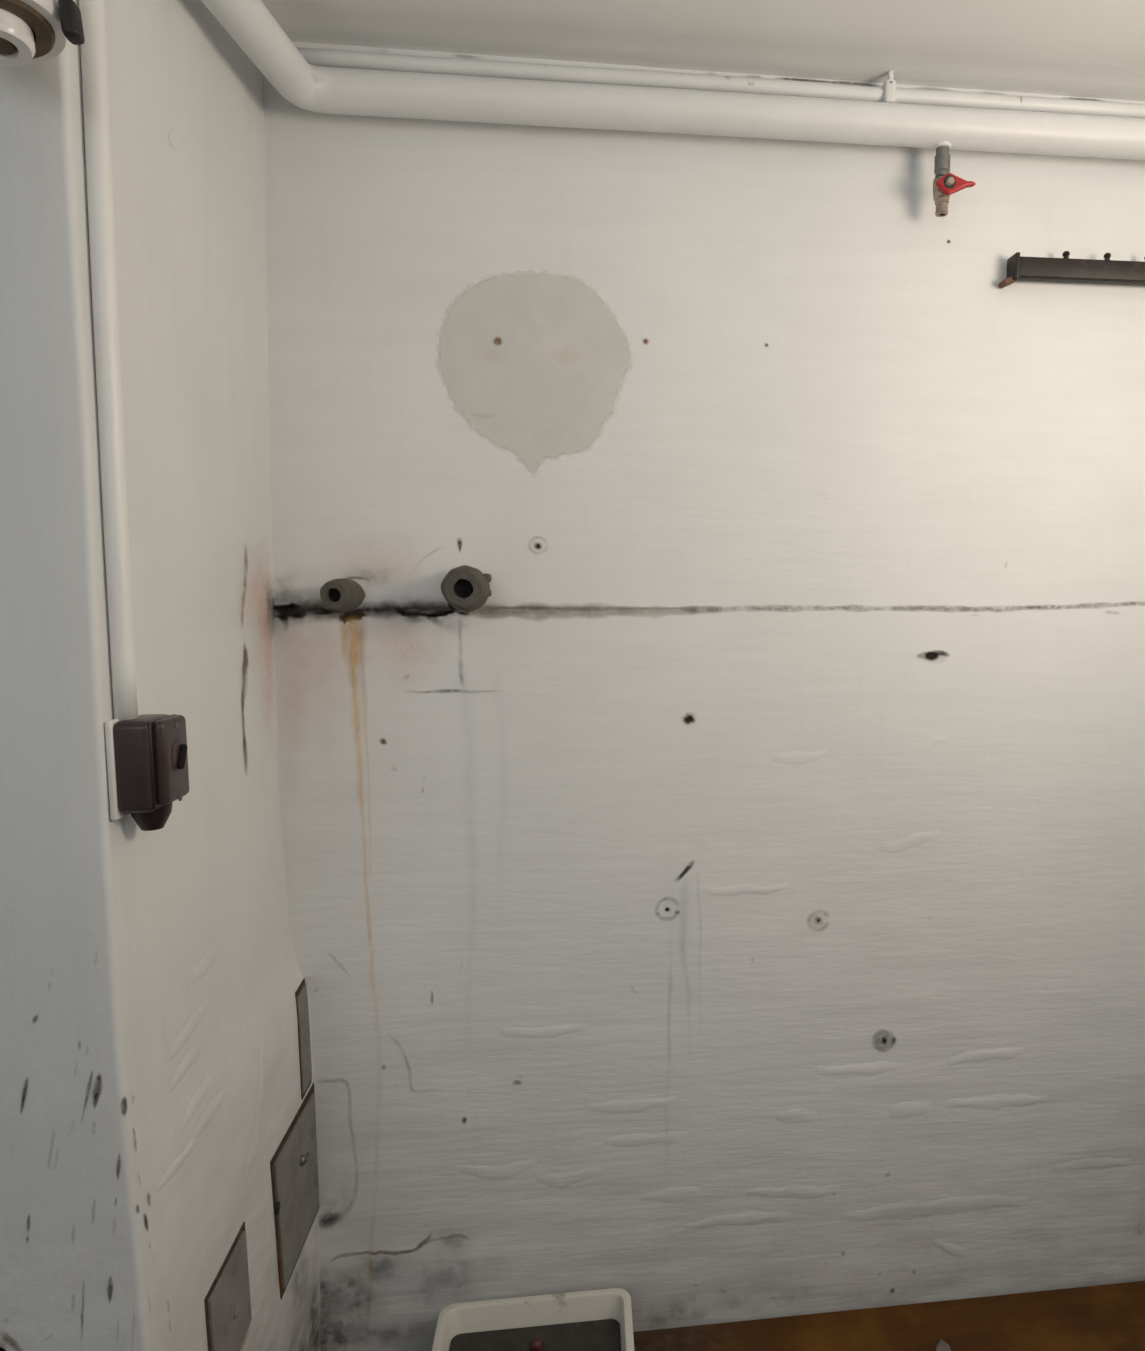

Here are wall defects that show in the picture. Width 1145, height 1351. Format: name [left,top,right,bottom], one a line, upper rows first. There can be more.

peeling [438,272,631,474]
crack [277,605,627,615]
crack [893,603,1085,611]
crack [241,648,249,765]
crack [373,1239,428,1254]